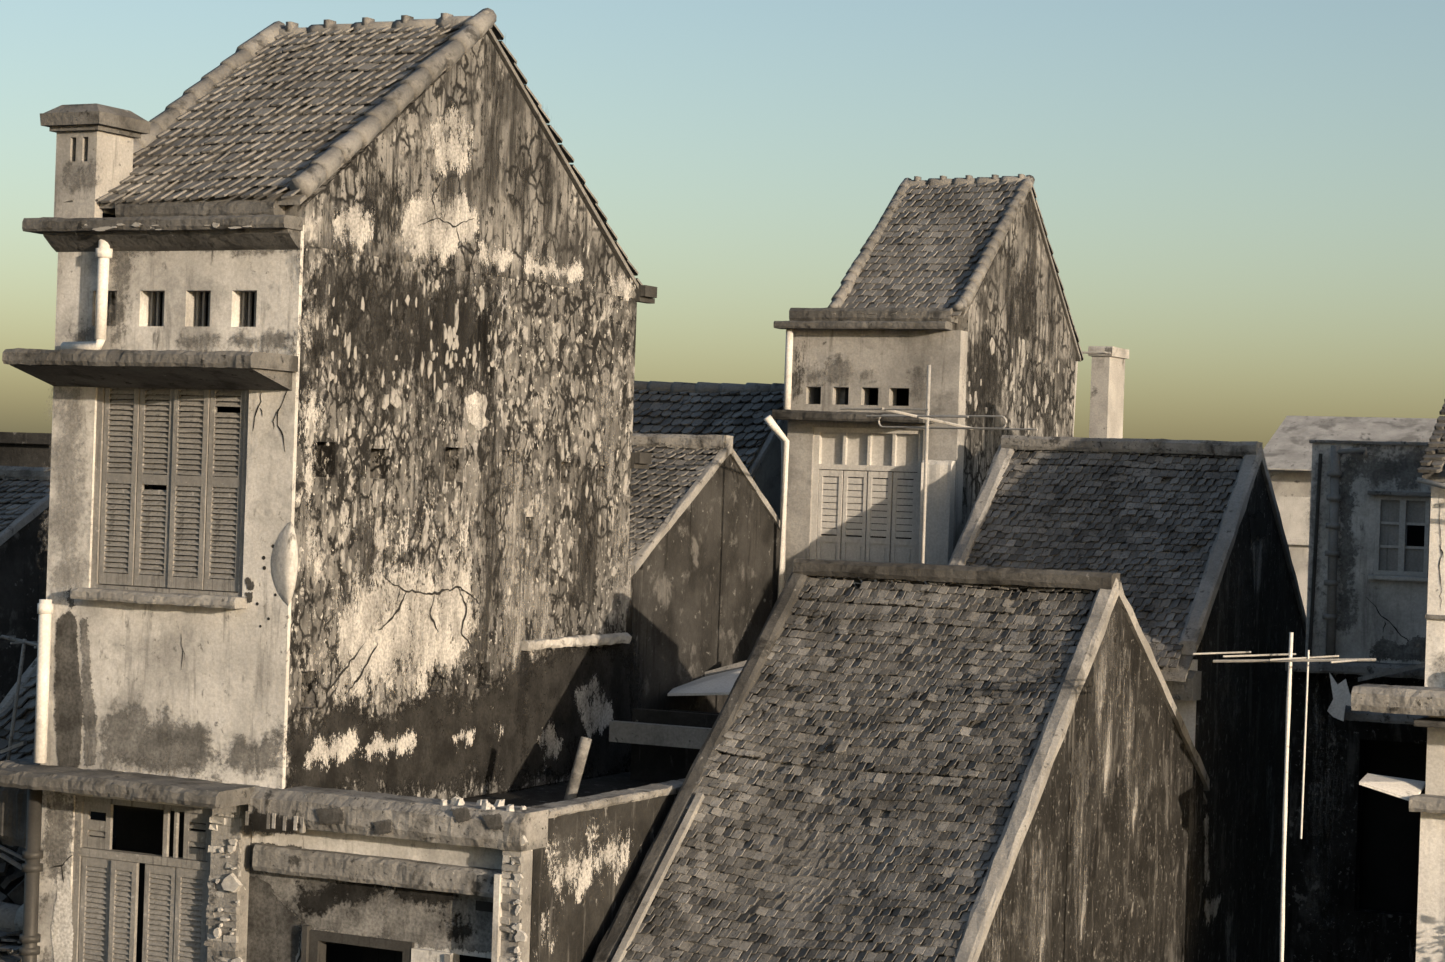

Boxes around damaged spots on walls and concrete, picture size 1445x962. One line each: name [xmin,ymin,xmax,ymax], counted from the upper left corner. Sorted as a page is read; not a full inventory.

damp [479,39,554,251]
damp [99,140,644,798]
peeling [298,103,635,772]
crack [327,577,481,696]
flaking render [213,807,493,962]
spalling [450,807,504,832]
peeling [509,818,636,962]